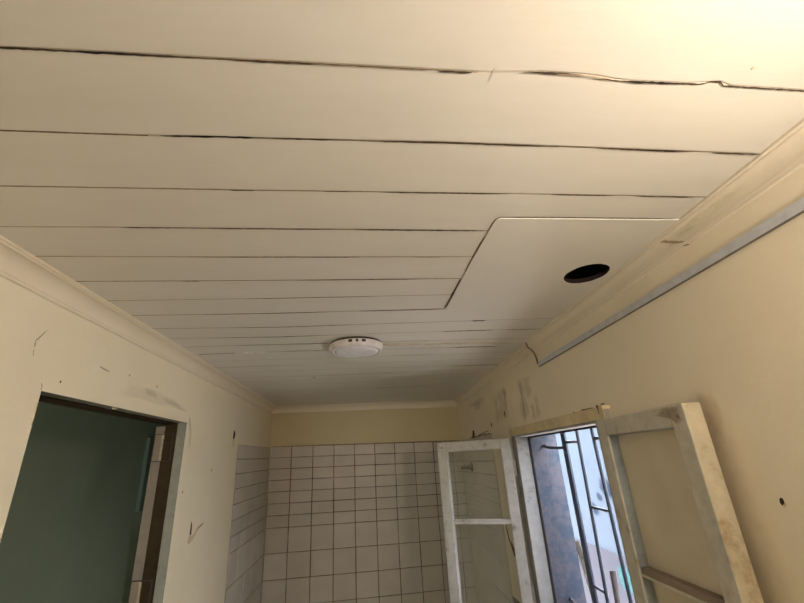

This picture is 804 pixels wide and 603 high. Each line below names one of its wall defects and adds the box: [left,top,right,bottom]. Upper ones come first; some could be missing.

crack [0,47,478,73]
crack [522,72,804,92]
crack [0,129,148,137]
crack [167,135,760,155]
crack [35,252,132,260]
crack [214,253,349,261]
crack [76,281,148,316]
crack [163,280,226,339]
crack [199,279,529,368]